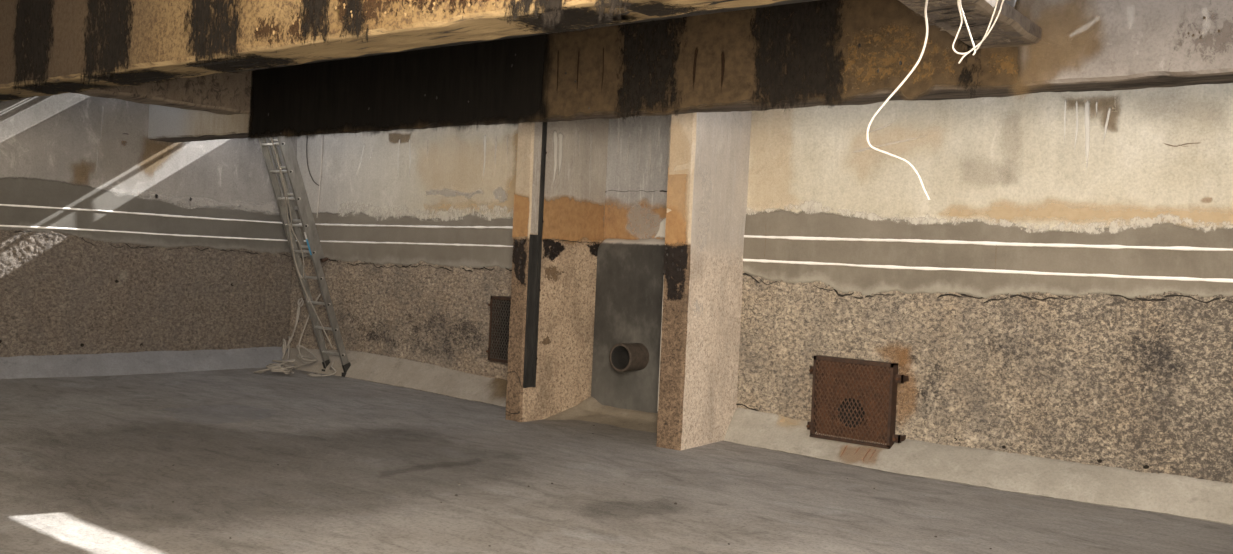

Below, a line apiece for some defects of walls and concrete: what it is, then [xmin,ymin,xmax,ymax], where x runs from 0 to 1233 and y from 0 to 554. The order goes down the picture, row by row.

damp [958,40,981,94]
damp [1018,0,1099,90]
damp [1064,98,1118,160]
damp [746,200,1233,234]